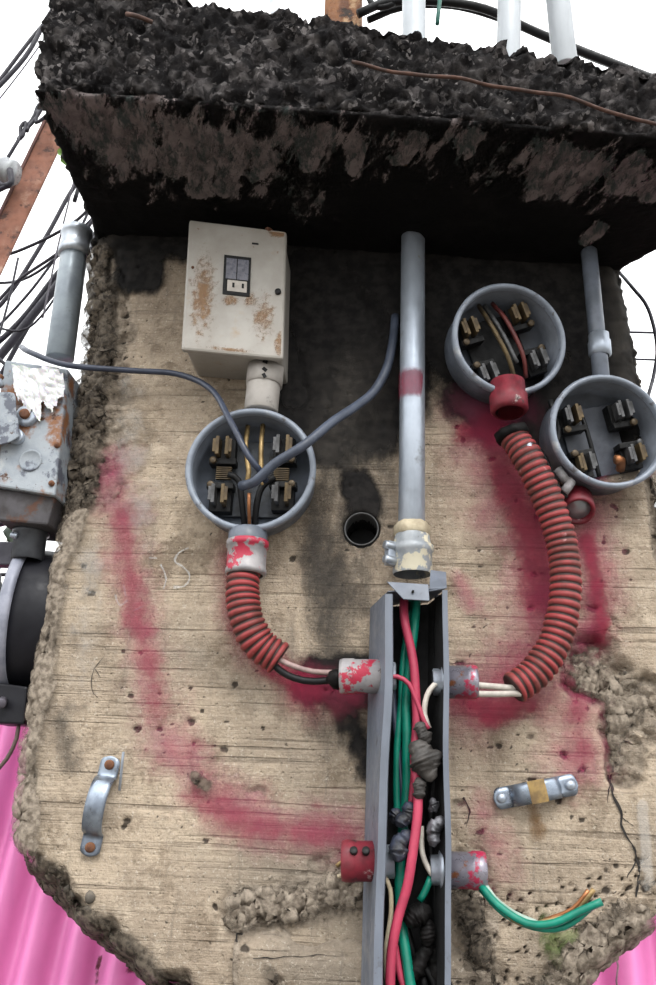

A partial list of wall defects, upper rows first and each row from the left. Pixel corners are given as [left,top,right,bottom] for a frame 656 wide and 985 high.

spalling [125,12,153,25]
spalling [351,60,656,126]
flaking render [34,88,656,247]
spalling [12,242,191,985]
spalling [570,647,649,773]
spalling [190,771,212,791]
crack [607,723,641,897]
spalling [517,898,656,985]